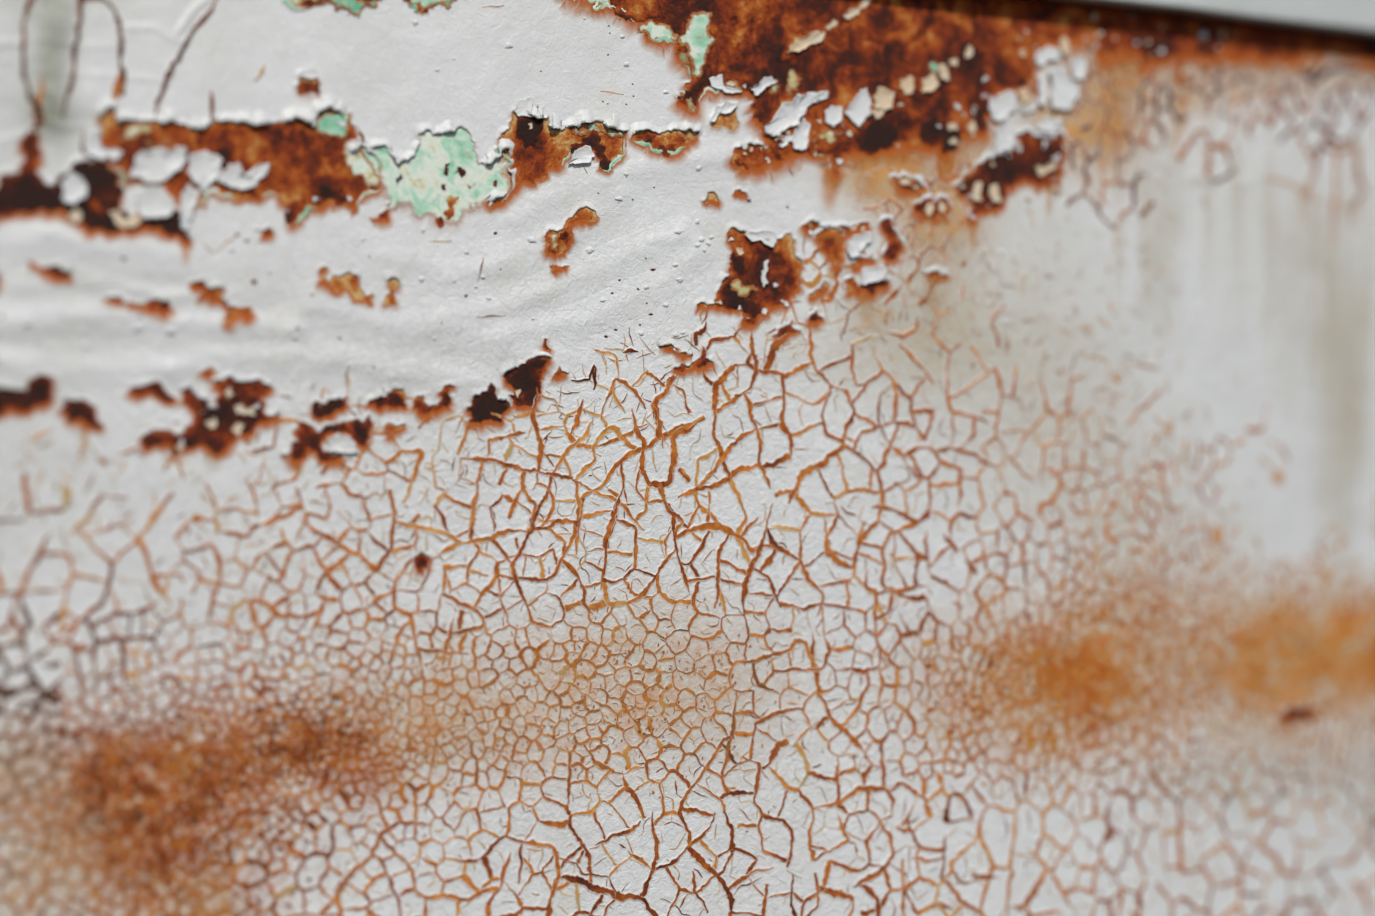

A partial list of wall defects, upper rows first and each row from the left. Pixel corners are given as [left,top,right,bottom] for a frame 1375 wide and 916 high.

crack [482,2,504,10]
crack [600,88,624,96]
peeling [0,0,1375,346]
corrosion [824,150,975,250]
corrosion [1040,63,1189,161]
crack [1012,45,1375,298]
peeling [0,370,106,432]
peeling [126,336,571,468]
peeling [655,337,716,376]
crack [0,195,1375,916]
corrosion [926,550,1212,768]
corrosion [34,634,752,916]